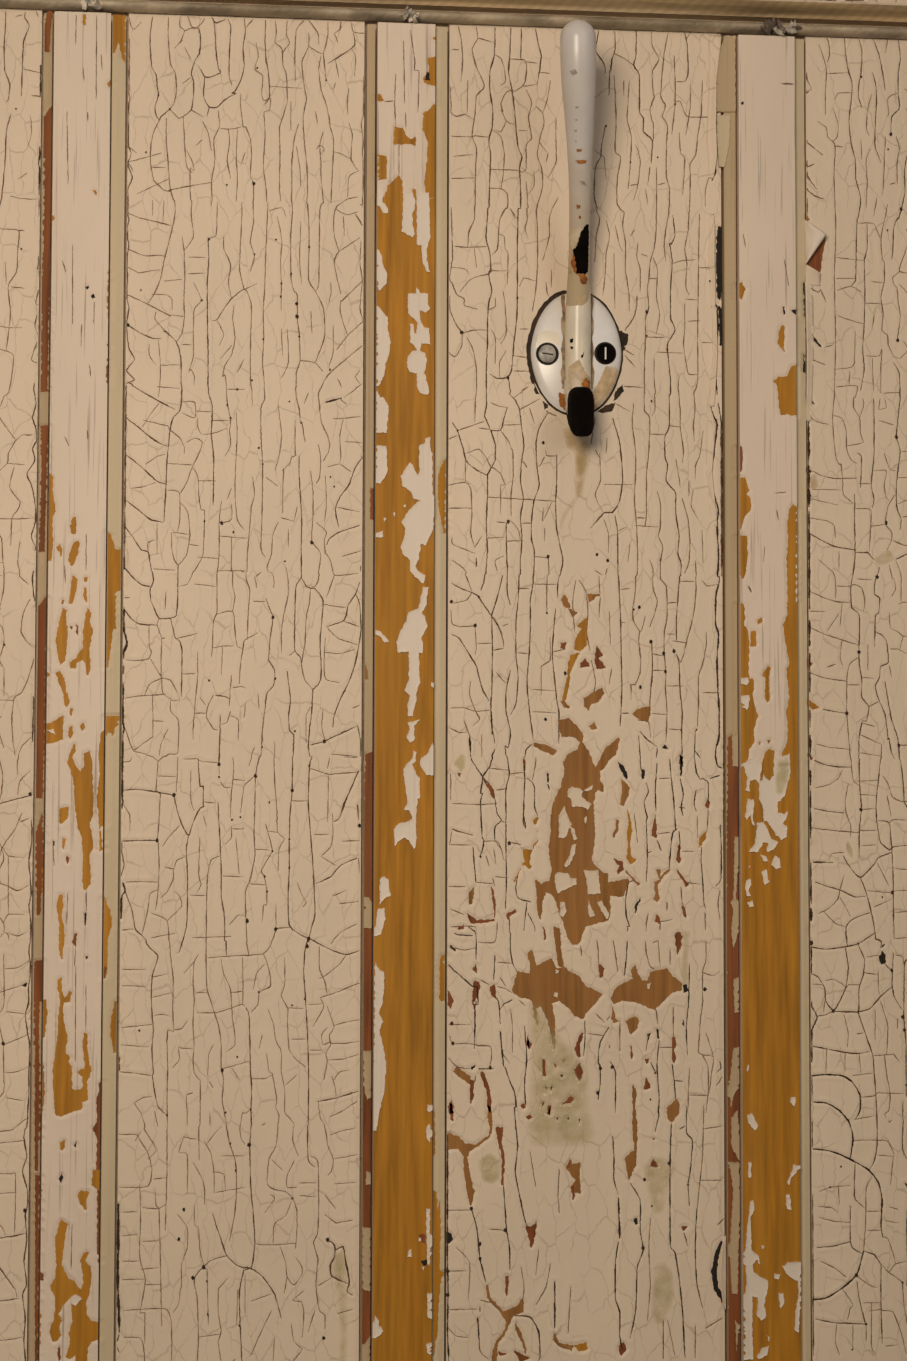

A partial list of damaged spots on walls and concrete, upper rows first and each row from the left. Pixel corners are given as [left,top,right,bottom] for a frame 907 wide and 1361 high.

peeling [41,106,55,392]
peeling [22,960,100,1361]
peeling [35,425,121,959]
crack [0,12,420,1361]
peeling [358,103,505,1361]
peeling [458,887,516,930]
peeling [486,1276,530,1361]
peeling [566,1159,581,1200]
peeling [512,595,689,1181]
peeling [740,446,751,579]
peeling [711,504,820,1361]
crack [764,39,907,1356]